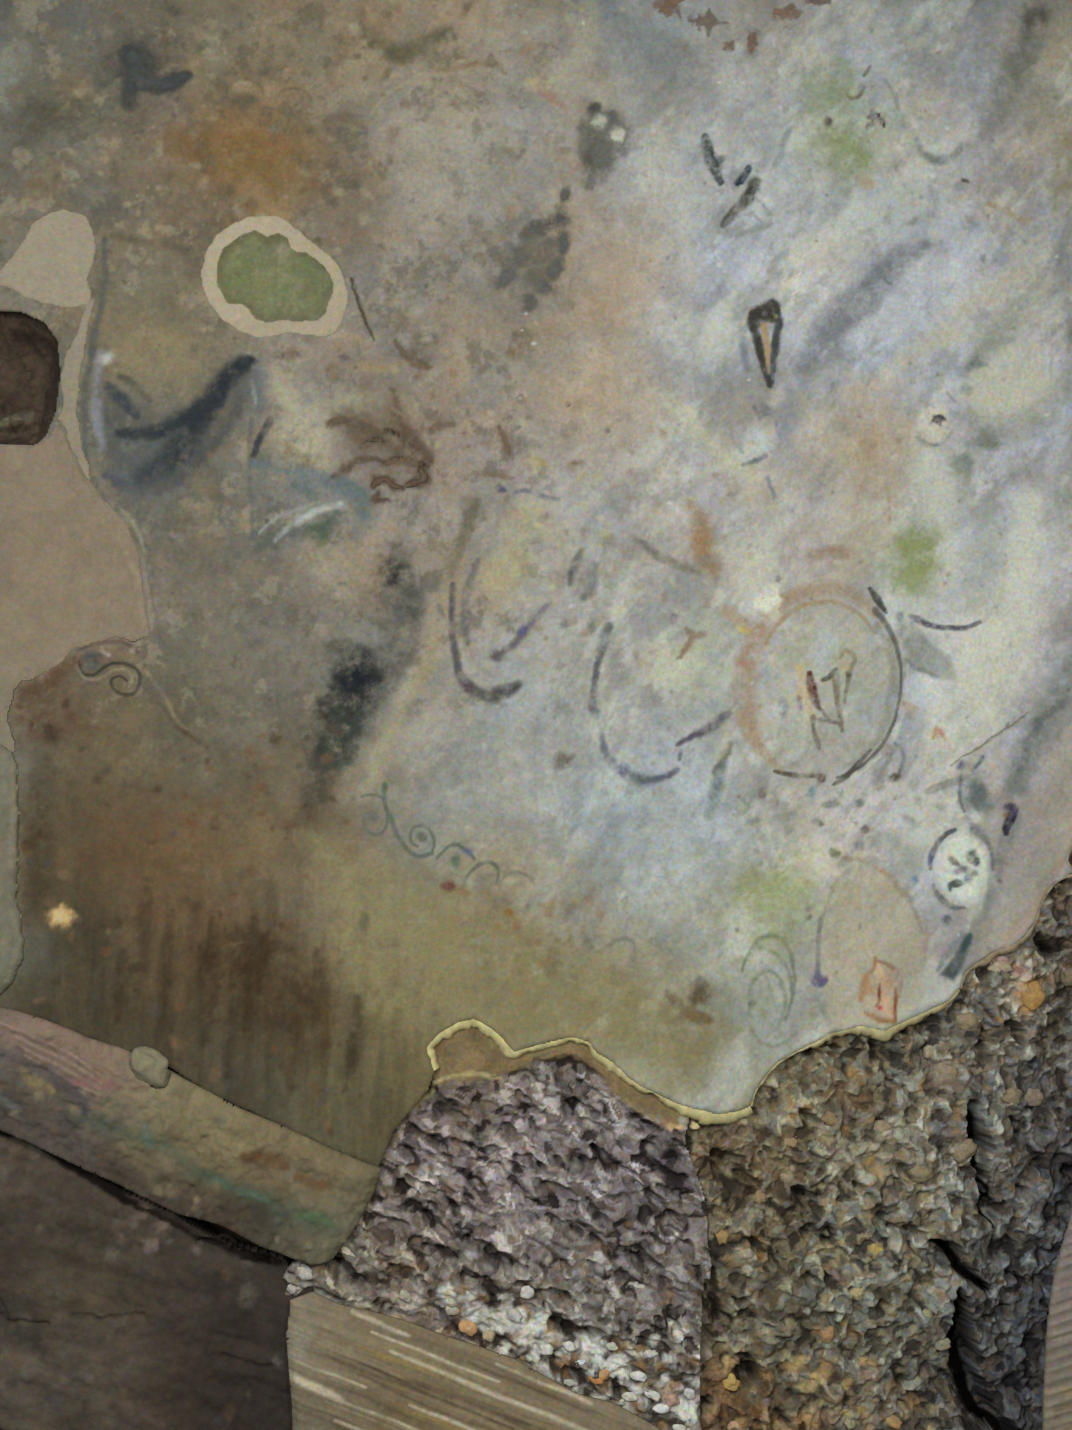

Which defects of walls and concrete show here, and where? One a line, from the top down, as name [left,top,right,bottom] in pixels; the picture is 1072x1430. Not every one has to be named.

leakage [220,231,333,320]
crack [0,1131,279,1264]
spalling [282,847,1072,1430]
crack [966,1099,995,1229]
crack [931,1239,1001,1430]